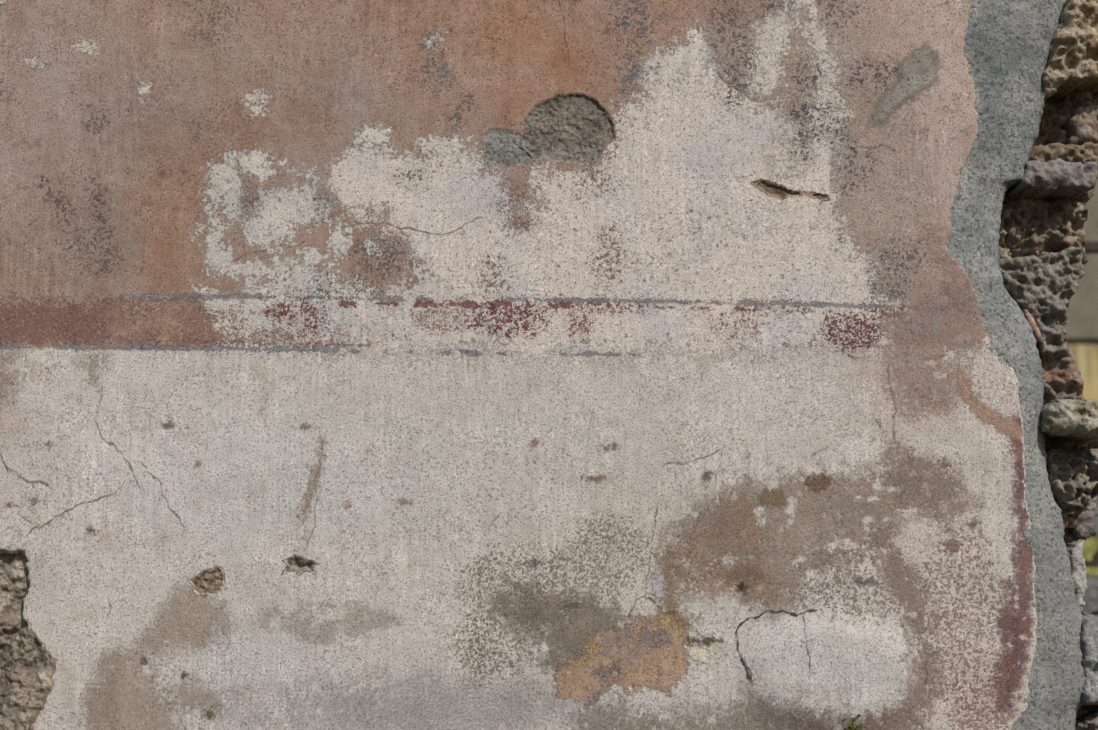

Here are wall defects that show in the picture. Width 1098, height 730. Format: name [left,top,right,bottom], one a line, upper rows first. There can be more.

peeling [183,0,936,379]
peeling [967,333,1020,422]
crack [1,454,51,488]
crack [19,391,184,536]
spalling [0,546,58,730]
spalling [188,565,226,598]
spalling [552,562,723,709]
leakage [293,439,1004,730]
crack [735,609,818,683]